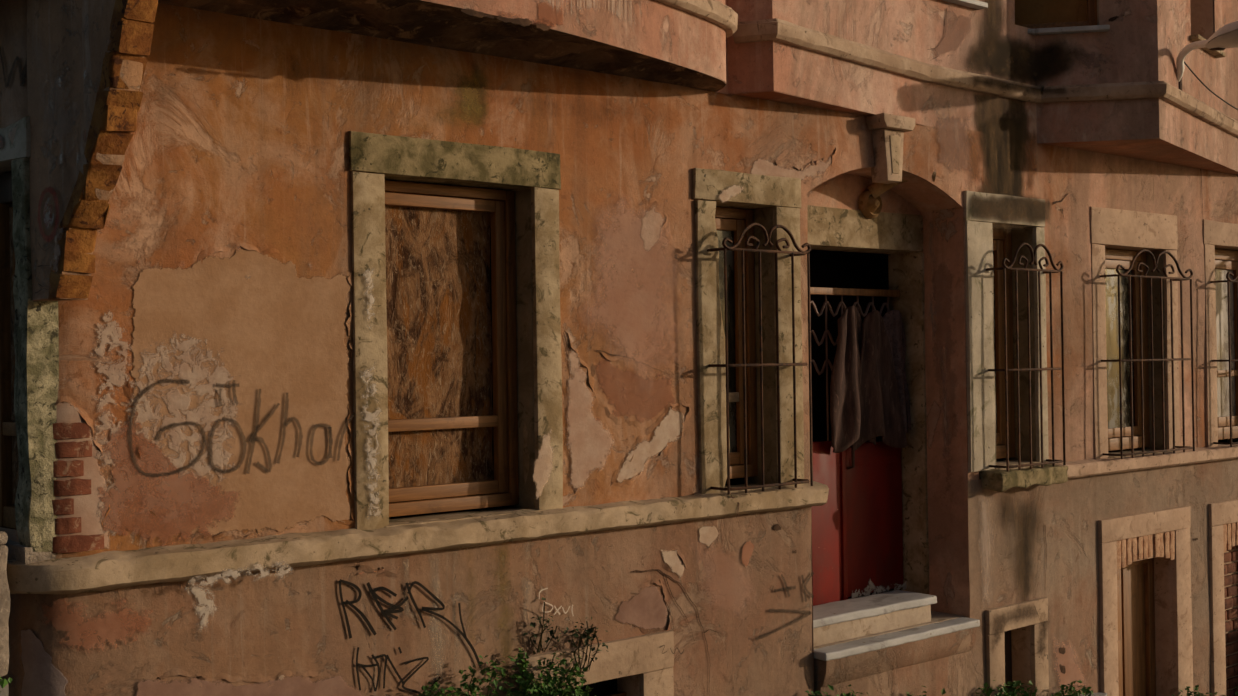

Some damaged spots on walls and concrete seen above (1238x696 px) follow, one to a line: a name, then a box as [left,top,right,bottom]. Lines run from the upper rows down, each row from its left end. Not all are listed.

spalling [48,0,158,300]
leakage [937,0,1080,228]
peeling [52,240,355,557]
spalling [533,431,553,499]
peeling [562,328,691,494]